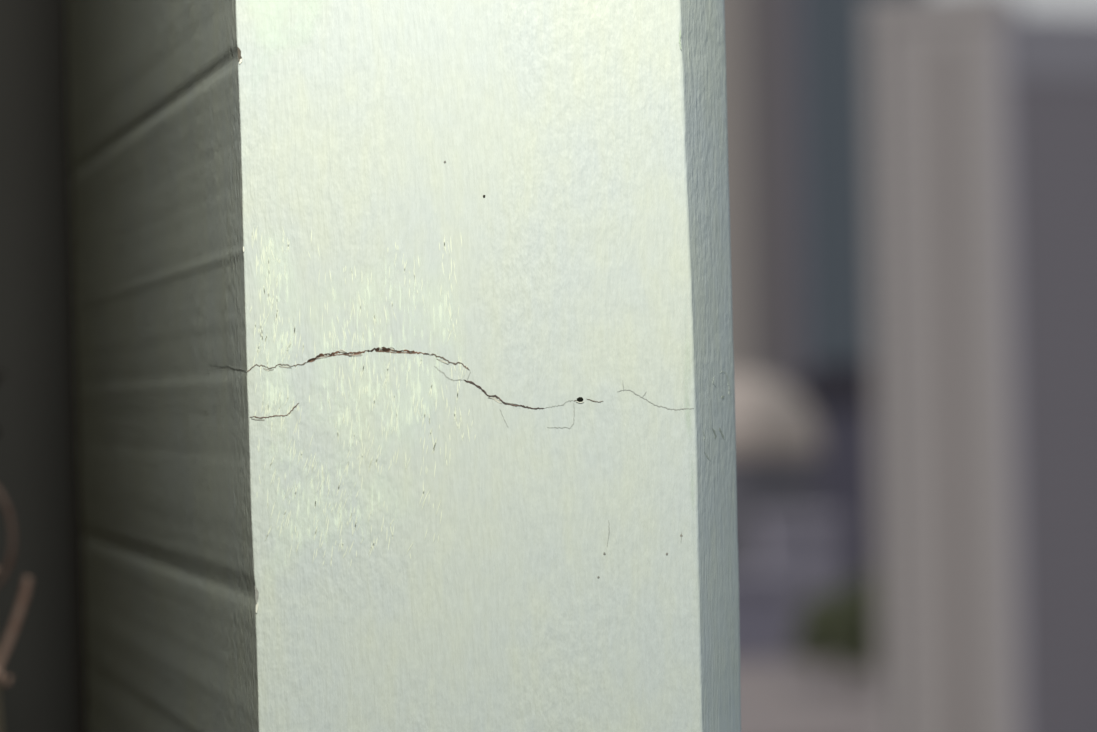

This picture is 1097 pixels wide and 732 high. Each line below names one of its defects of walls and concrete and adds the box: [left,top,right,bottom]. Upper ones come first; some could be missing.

crack [208,347,693,429]